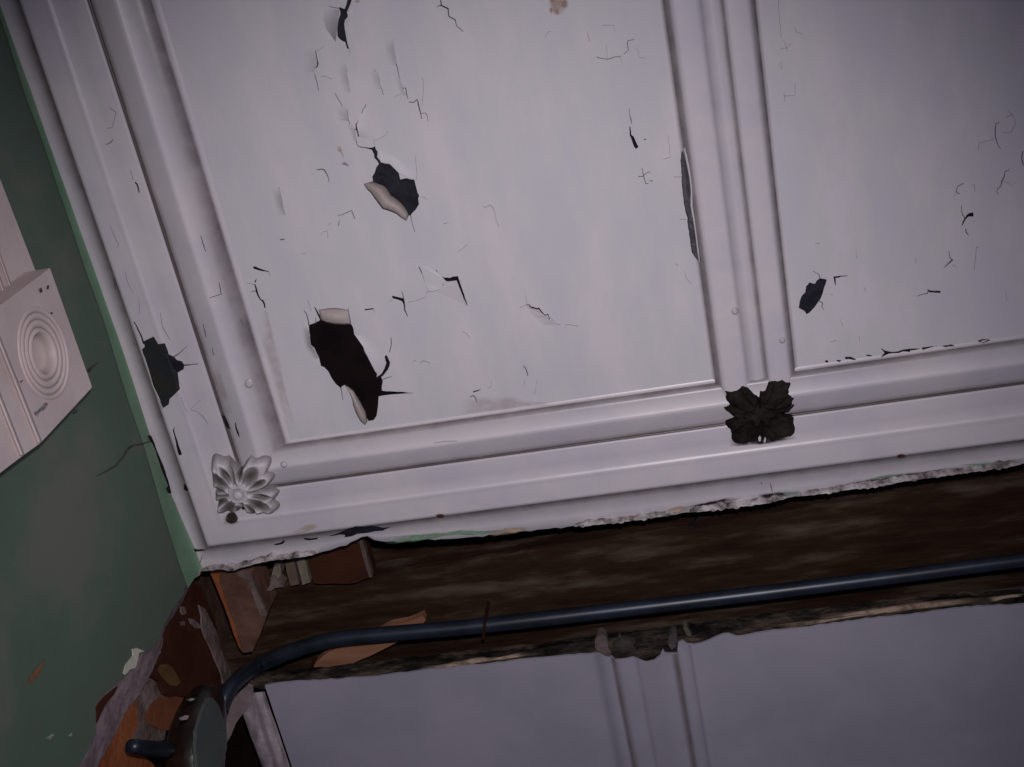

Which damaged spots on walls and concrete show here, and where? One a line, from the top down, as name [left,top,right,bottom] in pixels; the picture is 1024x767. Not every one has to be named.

crack [303,39,428,145]
peeling [356,139,419,232]
crack [629,110,670,184]
peeling [674,148,700,263]
crack [918,112,1024,296]
crack [241,266,270,327]
crack [365,264,469,337]
crack [520,295,576,326]
peeling [799,271,827,314]
peeling [134,322,196,409]
peeling [301,301,407,425]
peeling [304,526,390,540]